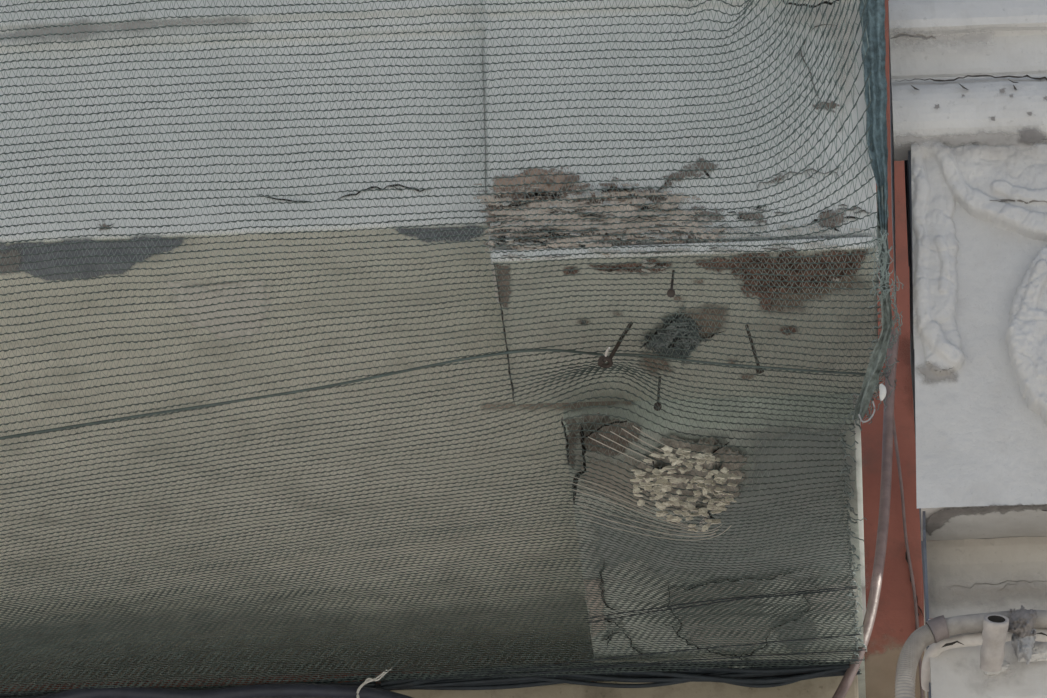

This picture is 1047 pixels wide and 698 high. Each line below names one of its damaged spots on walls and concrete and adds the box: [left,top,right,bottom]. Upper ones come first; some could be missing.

crack [902,75,1047,90]
crack [338,184,430,199]
peeling [474,158,870,313]
spalling [640,306,726,374]
spalling [561,412,642,504]
flaking render [630,435,748,532]
crack [598,561,652,658]
crack [666,572,810,660]
crack [952,580,1047,591]